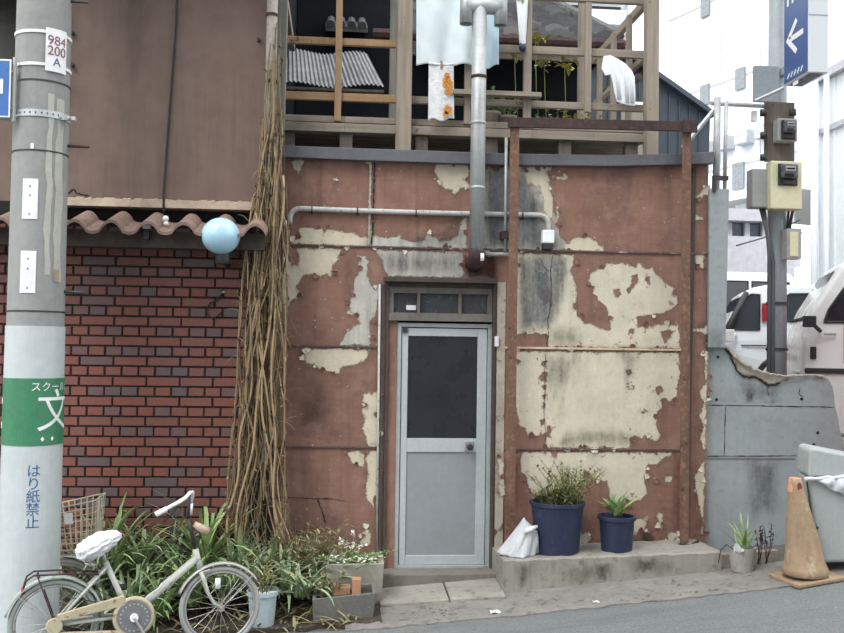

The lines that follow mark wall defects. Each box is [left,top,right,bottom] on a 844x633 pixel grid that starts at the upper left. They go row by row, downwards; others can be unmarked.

peeling [434,164,469,195]
damp [490,179,541,244]
peeling [696,185,711,202]
peeling [695,254,706,270]
peeling [280,217,468,376]
peeling [484,166,681,509]
flaking render [725,345,825,383]
peeling [693,322,713,449]
crack [276,497,343,523]
peeling [633,513,680,540]
peeling [693,460,710,537]